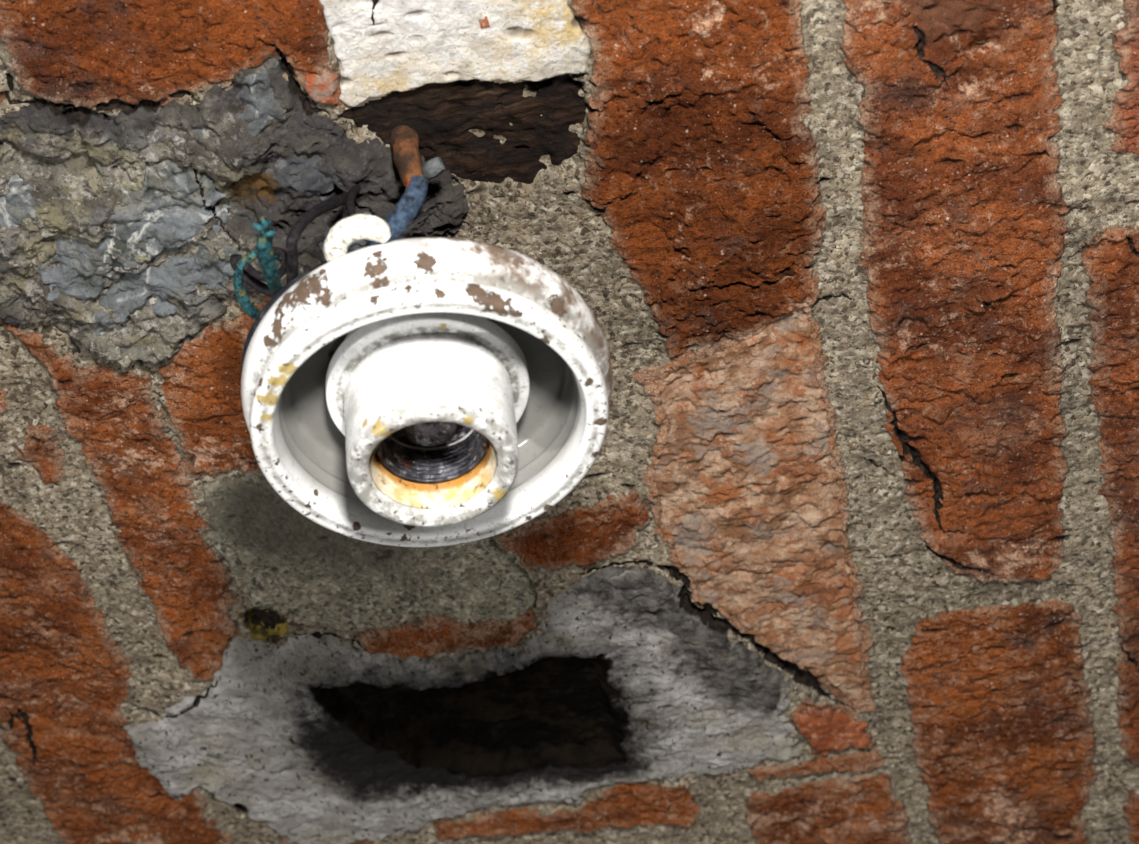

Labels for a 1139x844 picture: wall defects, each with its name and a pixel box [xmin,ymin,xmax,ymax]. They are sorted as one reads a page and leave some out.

crack [0,73,200,121]
spalling [0,57,406,368]
spalling [393,168,469,241]
crack [864,385,994,576]
spalling [250,608,286,629]
crack [573,560,854,709]
peeling [122,720,198,802]
peeling [417,781,588,820]